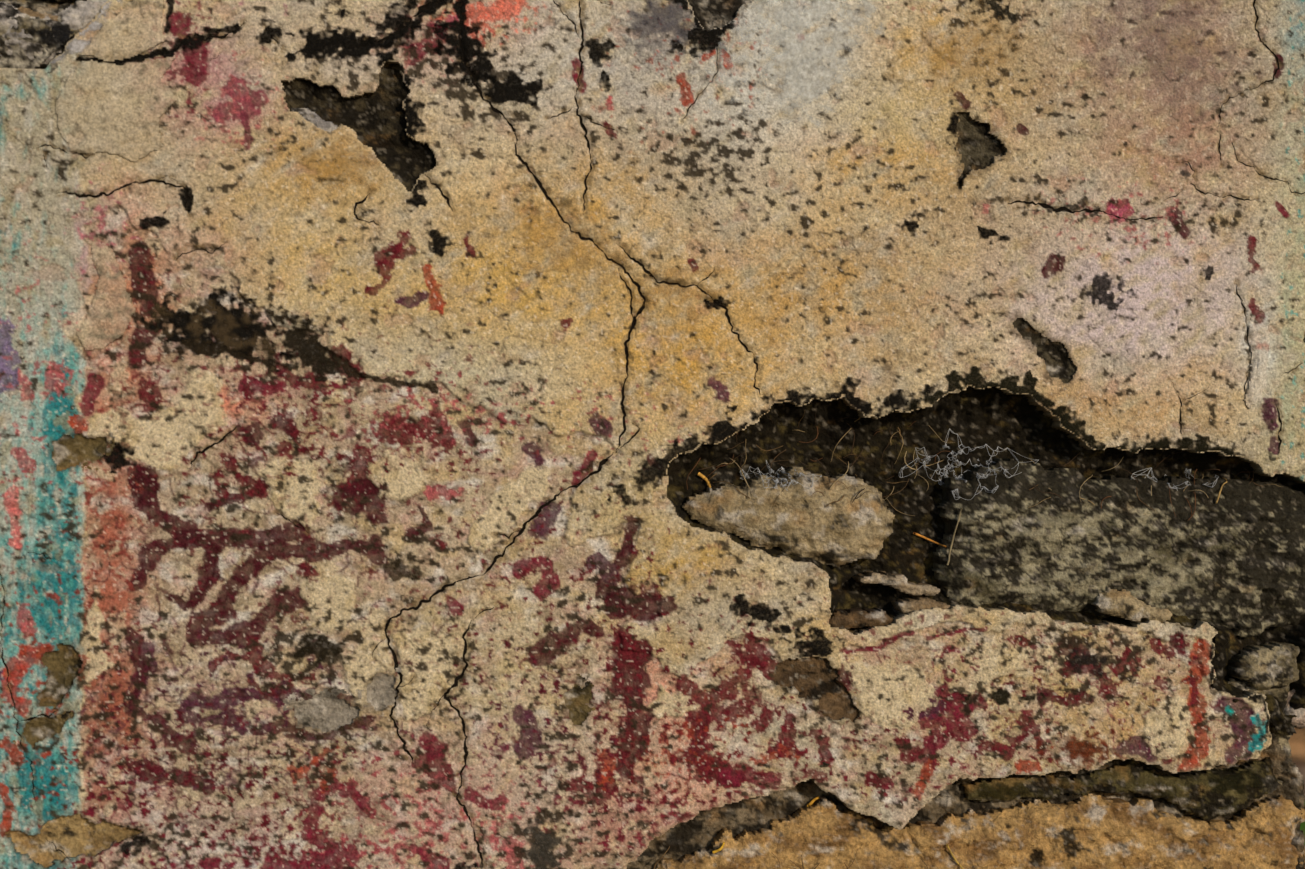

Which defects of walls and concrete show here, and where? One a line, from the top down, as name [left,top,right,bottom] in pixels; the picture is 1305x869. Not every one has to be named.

peeling [0,0,177,162]
spalling [281,63,436,192]
crack [354,191,379,225]
spalling [956,112,1006,189]
crack [1008,0,1305,220]
crack [361,0,760,867]
crack [1172,382,1208,440]
crack [1236,283,1305,454]
flaking render [667,386,1305,869]
spalling [13,643,85,747]
spalling [283,688,360,737]
spalling [627,762,888,869]